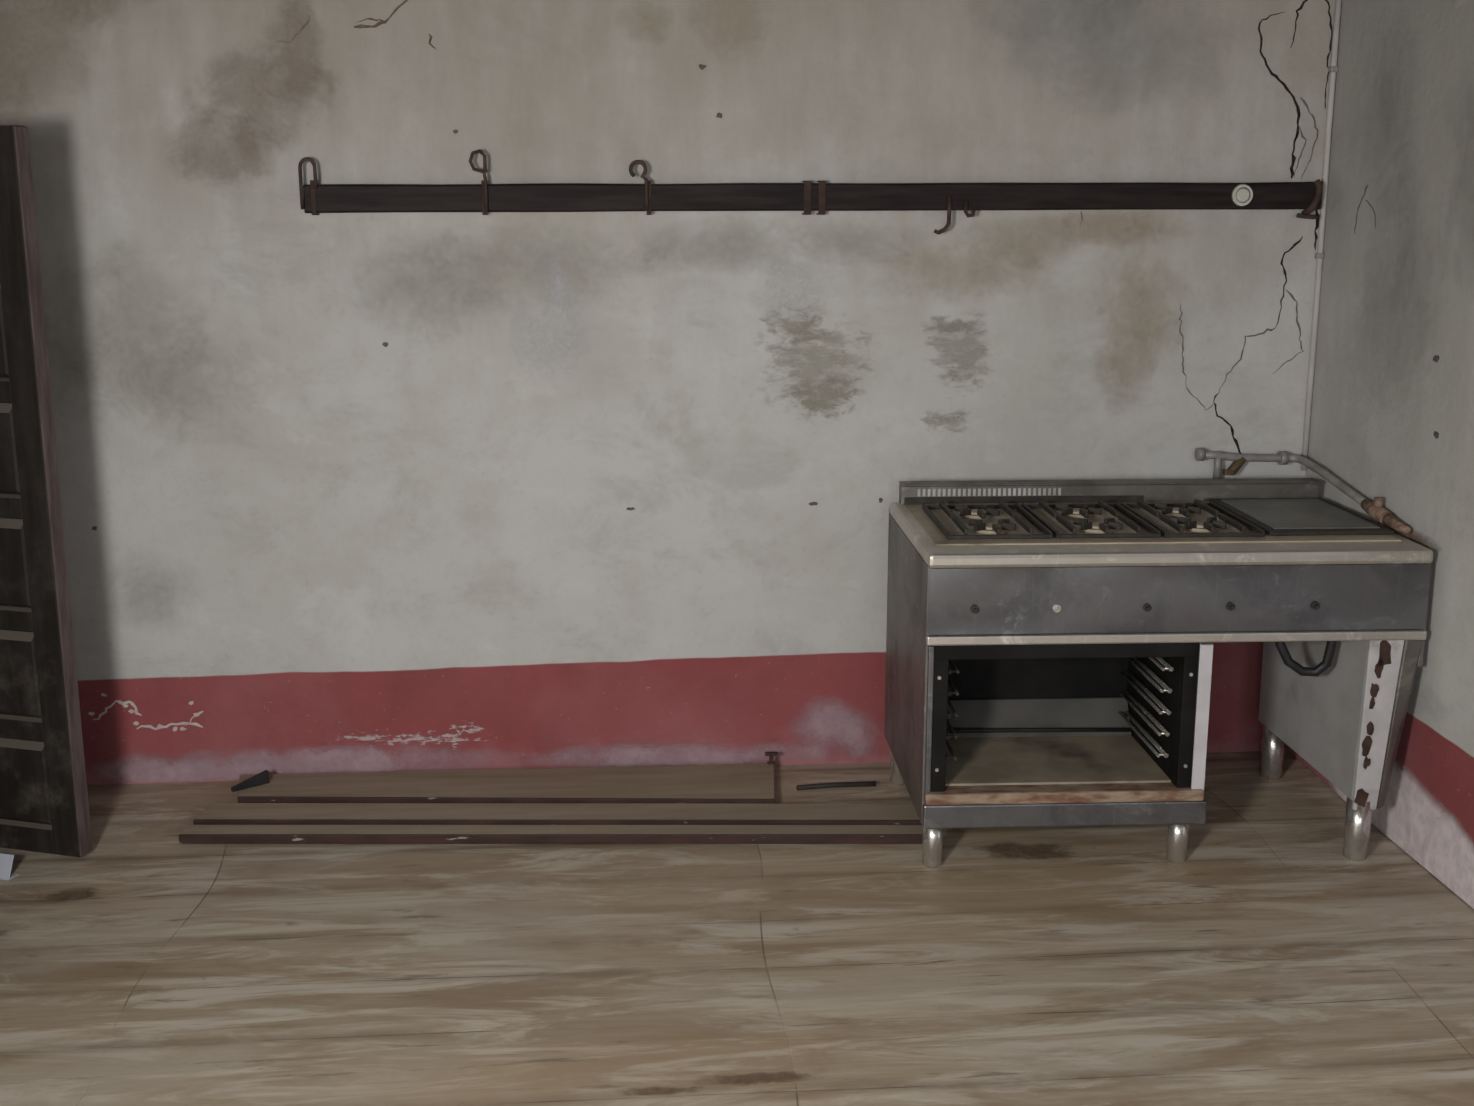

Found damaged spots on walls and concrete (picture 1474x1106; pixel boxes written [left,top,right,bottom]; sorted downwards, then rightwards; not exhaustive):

crack [1179,0,1333,454]
crack [1354,185,1376,234]
peeling [88,693,203,731]
peeling [337,722,498,750]
leakage [602,746,781,767]
leakage [803,705,867,755]